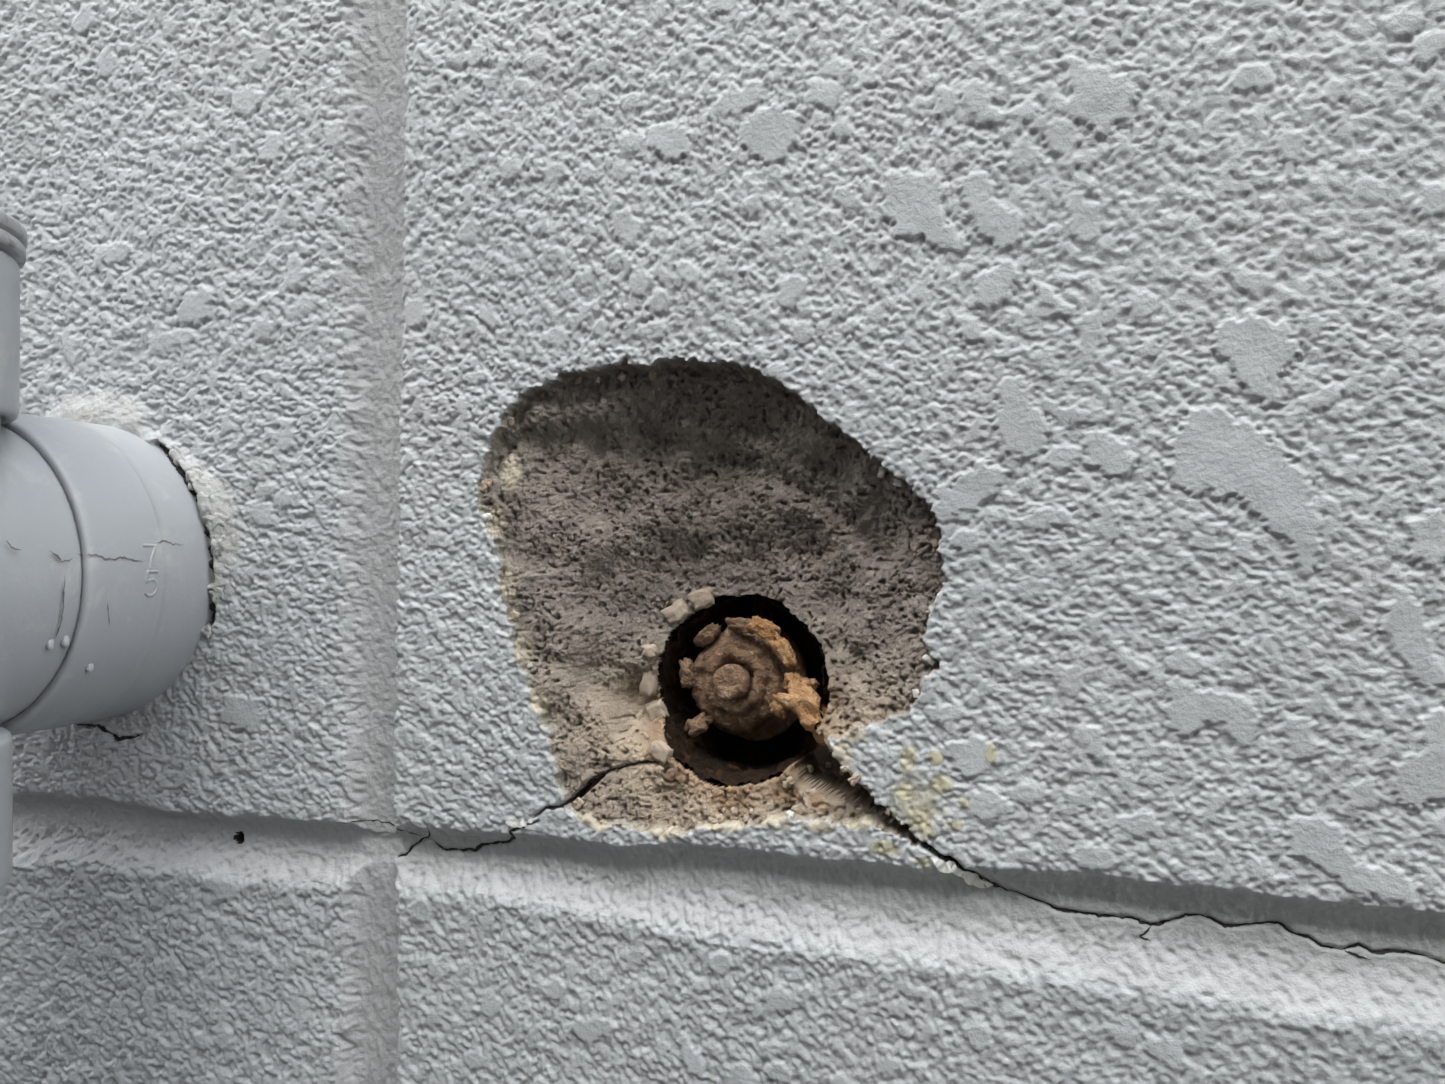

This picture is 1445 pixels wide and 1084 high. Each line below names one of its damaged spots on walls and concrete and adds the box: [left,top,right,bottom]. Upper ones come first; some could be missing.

spalling [477,357,947,847]
crack [338,760,659,857]
rust [648,694,825,809]
peeling [930,856,993,888]
crack [794,744,1445,964]